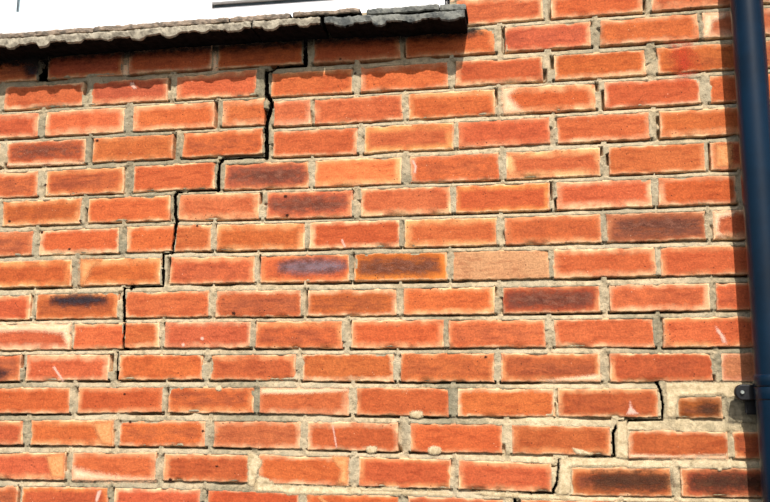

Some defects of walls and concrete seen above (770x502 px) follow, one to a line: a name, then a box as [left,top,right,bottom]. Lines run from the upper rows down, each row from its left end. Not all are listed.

crack [117,42,308,380]
crack [585,382,664,458]
crack [513,461,560,502]